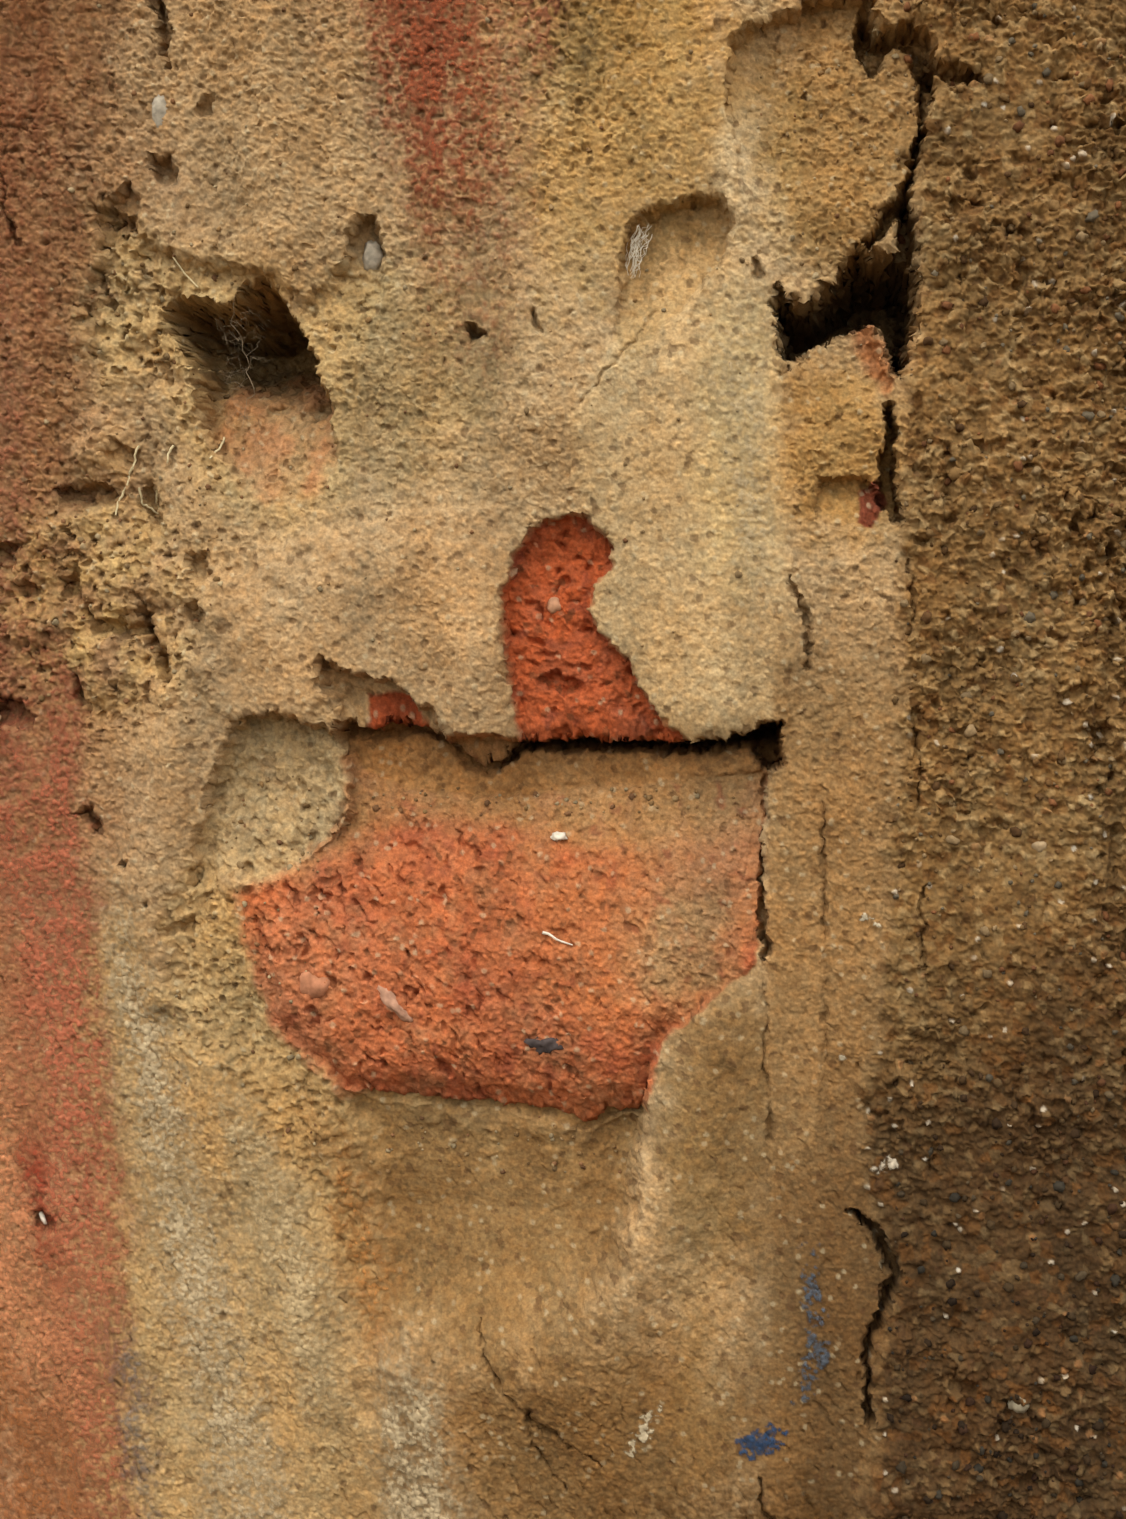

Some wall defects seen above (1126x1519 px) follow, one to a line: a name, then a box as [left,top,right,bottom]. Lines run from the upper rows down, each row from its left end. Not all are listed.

crack [852,0,985,311]
spalling [158,275,343,512]
crack [873,402,919,645]
spalling [186,509,788,934]
spalling [524,1037,564,1055]
crack [755,766,777,1147]
crack [845,1208,906,1431]